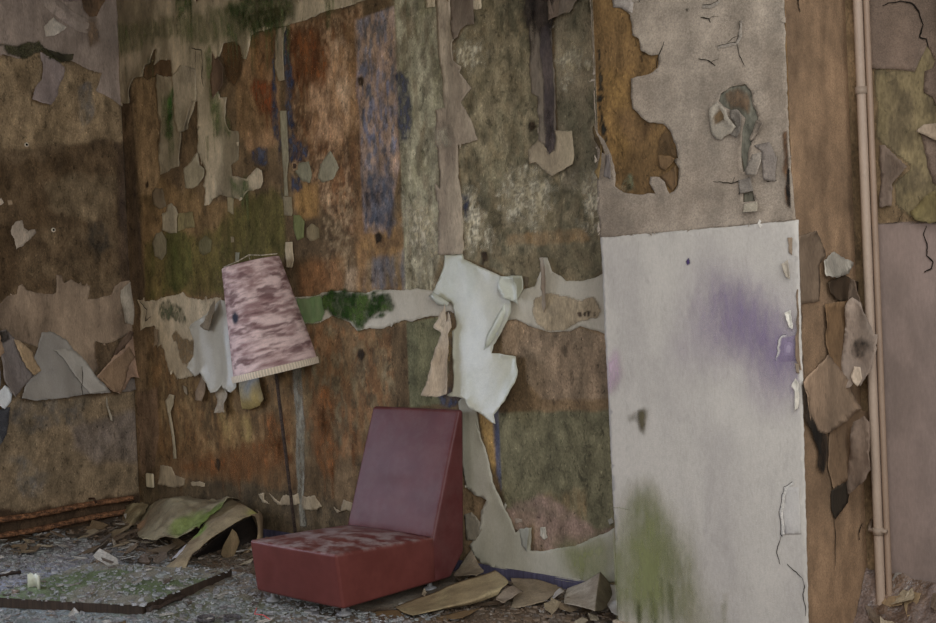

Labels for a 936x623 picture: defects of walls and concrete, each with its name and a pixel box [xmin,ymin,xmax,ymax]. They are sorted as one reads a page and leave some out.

flaking render [144,54,172,80]
leakage [522,0,607,154]
peeling [590,0,796,238]
crack [701,0,721,23]
crack [700,21,745,66]
flaking render [862,0,936,224]
crack [883,0,929,47]
peeling [0,386,12,409]
peeling [781,231,869,519]
crack [776,482,806,616]